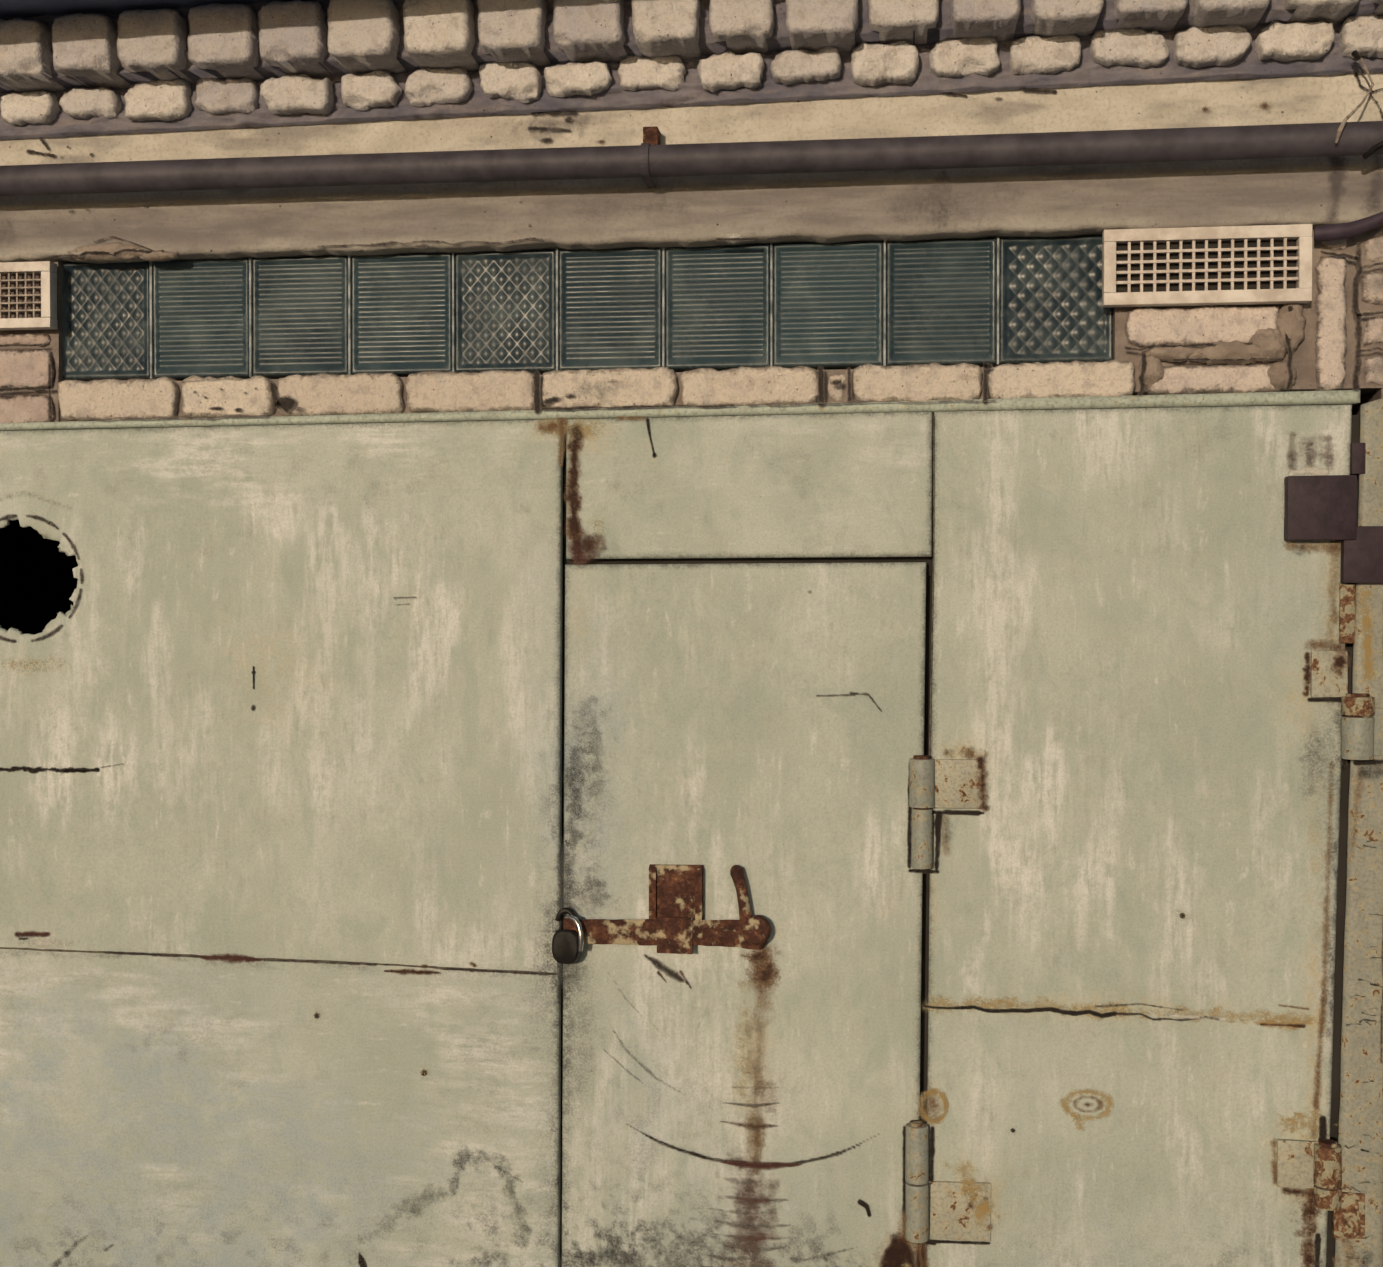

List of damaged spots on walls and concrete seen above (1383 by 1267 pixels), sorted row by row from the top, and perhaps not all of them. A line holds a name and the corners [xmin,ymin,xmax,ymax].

corrosion [538,417,566,465]
corrosion [1303,588,1375,702]
crack [923,996,1312,1030]
crack [1346,914,1383,1083]
corrosion [726,947,778,1267]
corrosion [1271,894,1330,1267]
corrosion [881,1162,999,1267]
crack [1335,1235,1372,1267]